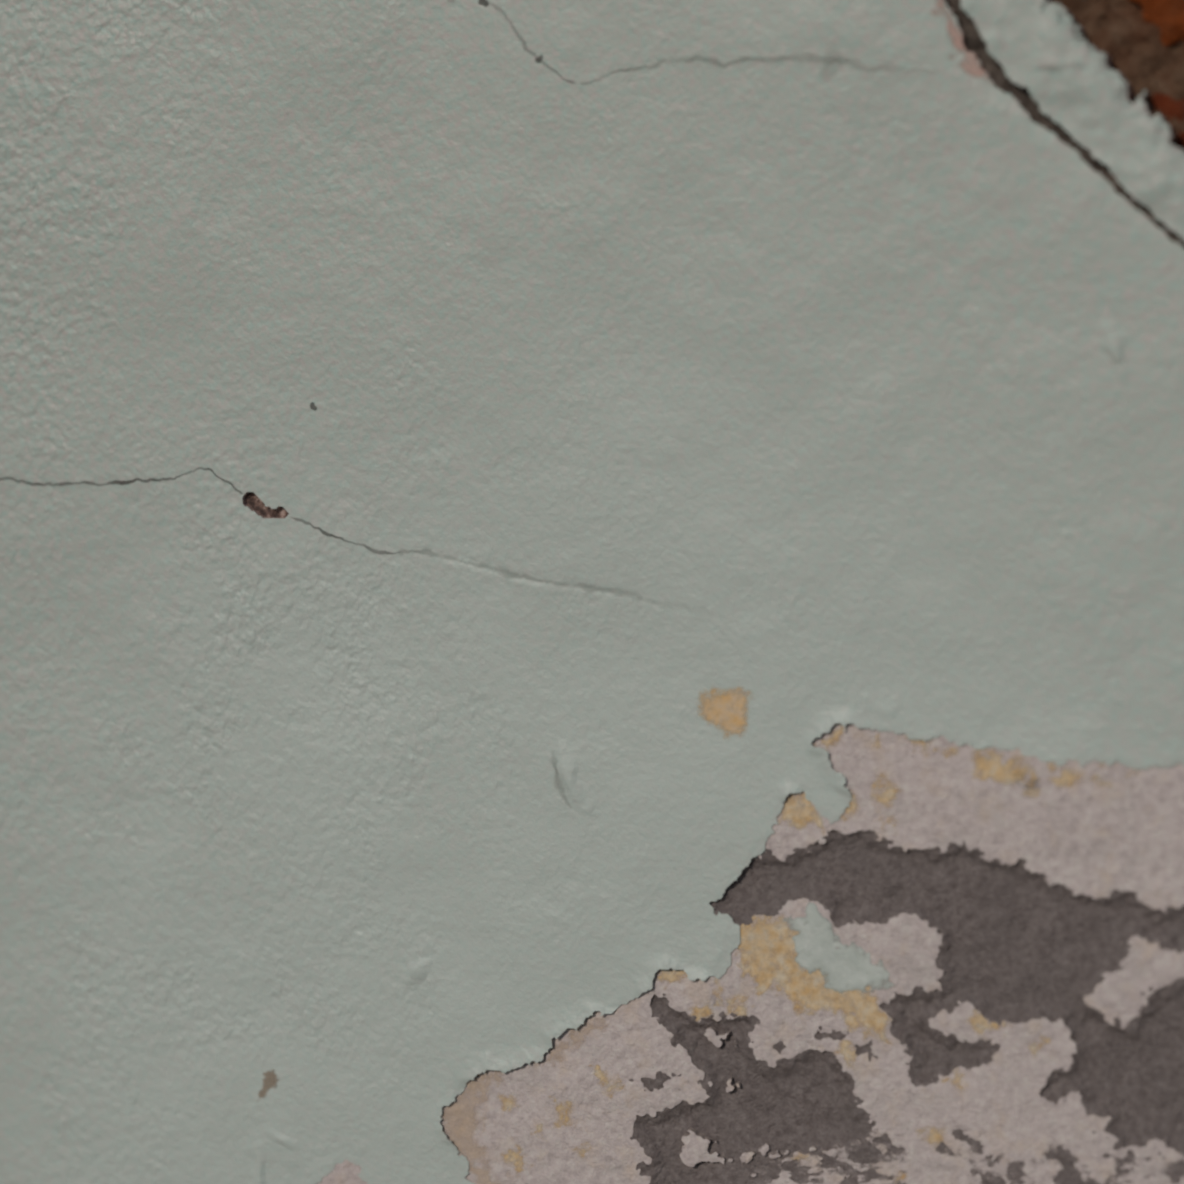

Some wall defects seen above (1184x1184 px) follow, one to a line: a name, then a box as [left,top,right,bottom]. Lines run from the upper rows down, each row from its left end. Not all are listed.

crack [932,0,1184,247]
flaking render [960,0,1184,245]
crack [114,477,138,485]
crack [245,492,289,518]
peeling [699,687,749,735]
peeling [440,723,1184,1184]
peeling [261,1072,276,1097]